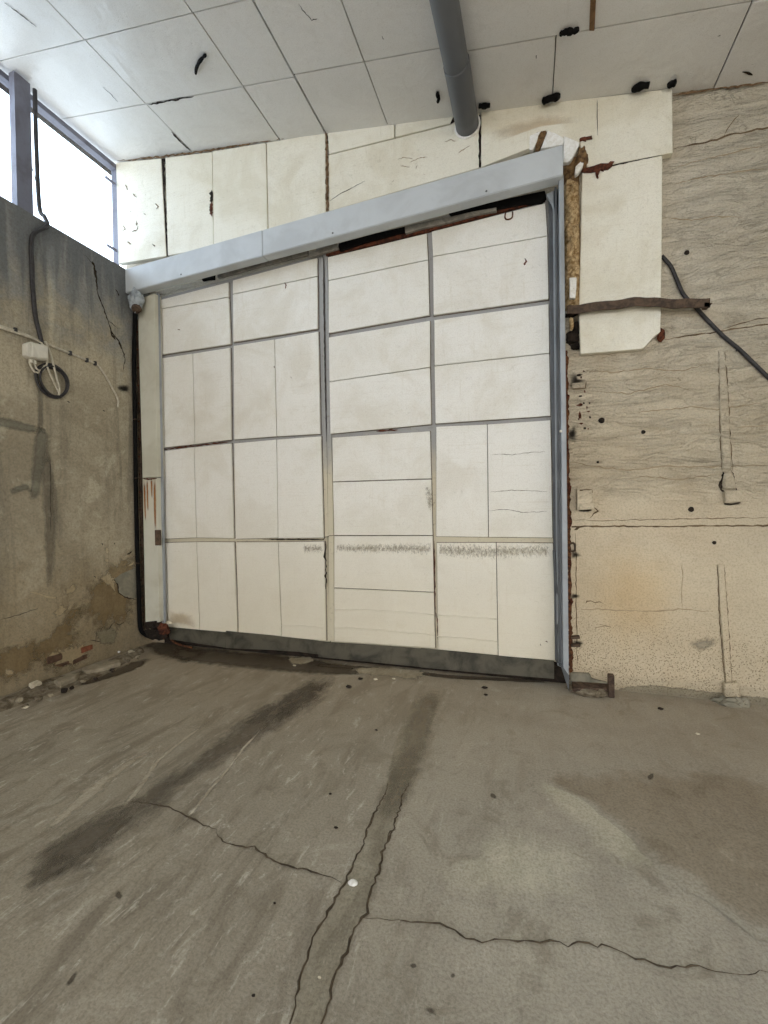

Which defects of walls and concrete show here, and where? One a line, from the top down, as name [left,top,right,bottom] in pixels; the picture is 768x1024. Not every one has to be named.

crack [86,256,125,370]
leakage [0,390,55,578]
rust [143,478,157,526]
flaking render [101,558,137,600]
flaking render [46,628,120,670]
leakage [147,642,386,674]
leakage [420,671,542,682]
leakage [533,764,768,940]
crack [131,783,767,1024]